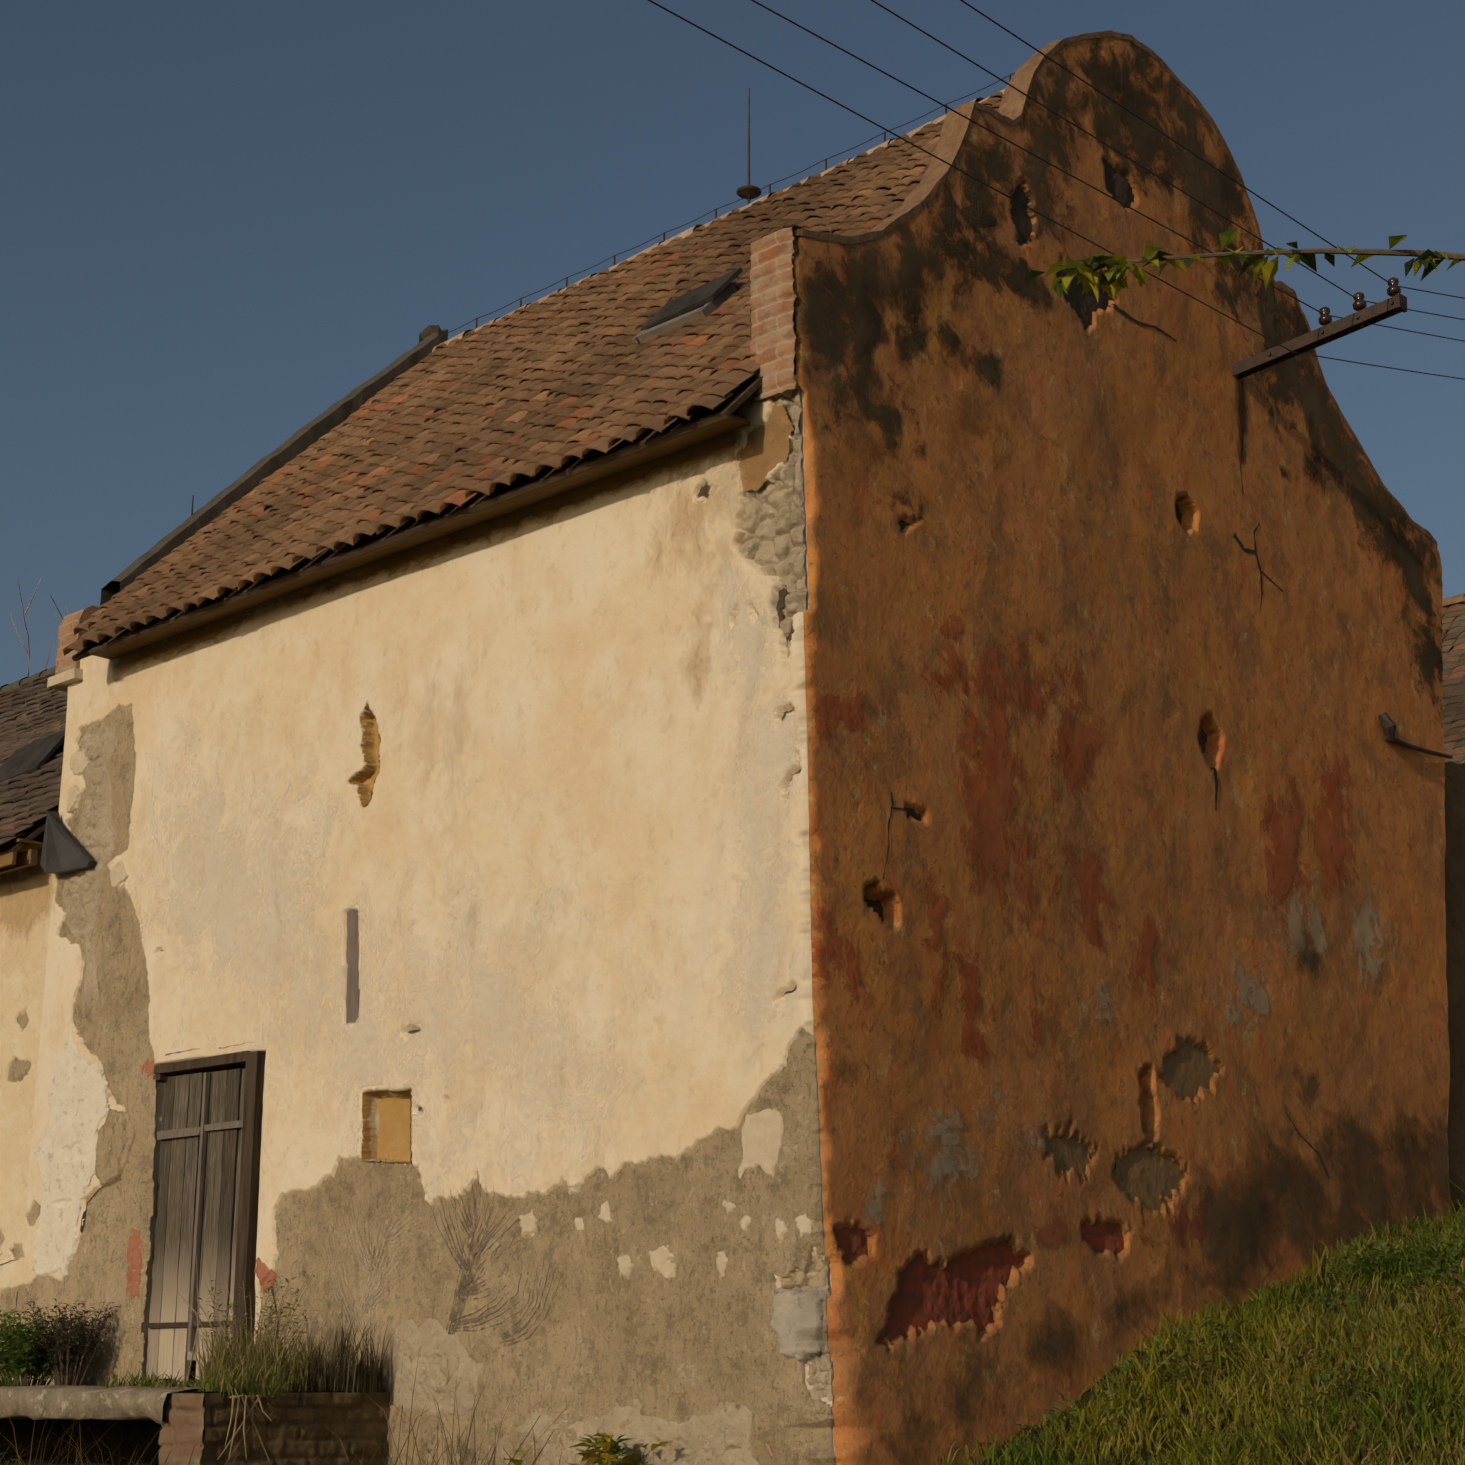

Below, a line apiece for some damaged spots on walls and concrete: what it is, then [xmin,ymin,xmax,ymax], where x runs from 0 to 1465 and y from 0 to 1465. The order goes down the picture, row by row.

damp [964,211,1051,310]
damp [912,317,1004,389]
damp [1236,378,1247,461]
spalling [738,388,808,657]
crack [1233,434,1283,611]
spalling [349,703,381,807]
peeling [1269,873,1400,1002]
spalling [0,705,163,1386]
spalling [1158,1040,1220,1101]
spalling [254,1028,1011,1465]
flaking render [876,1145,1212,1347]
damp [1188,1101,1450,1304]